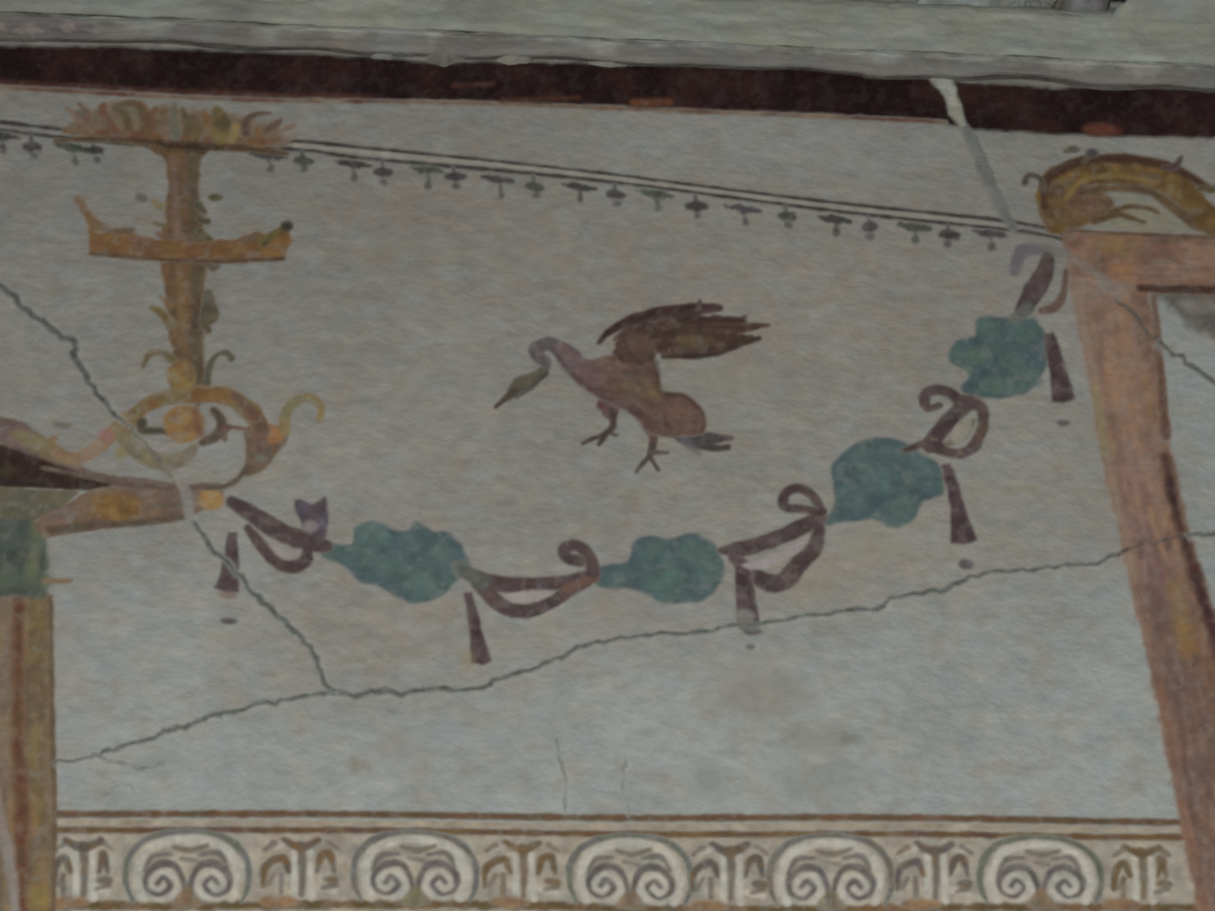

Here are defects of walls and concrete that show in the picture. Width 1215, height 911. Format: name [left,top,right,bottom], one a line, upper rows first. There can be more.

crack [930,79,1017,231]
crack [0,281,1215,795]
crack [555,737,567,809]